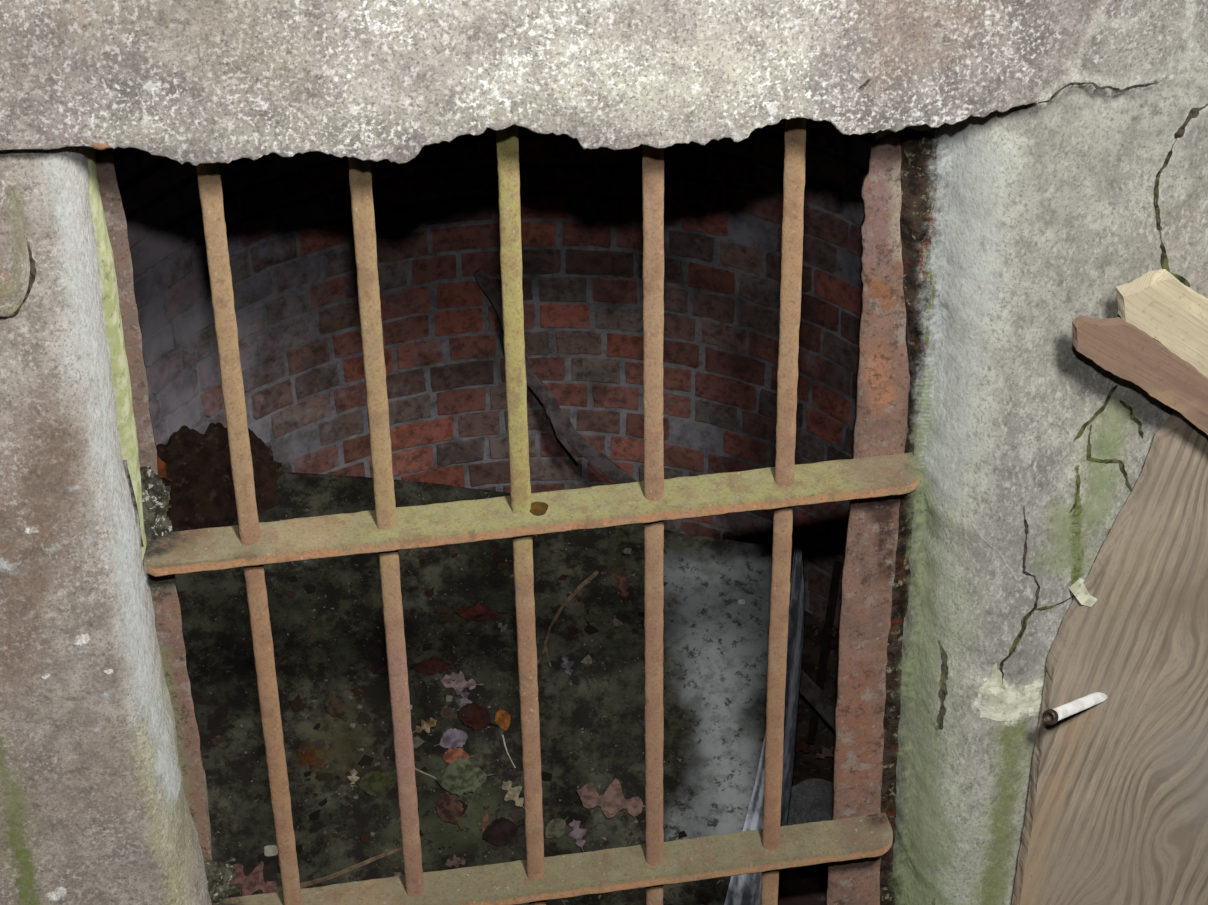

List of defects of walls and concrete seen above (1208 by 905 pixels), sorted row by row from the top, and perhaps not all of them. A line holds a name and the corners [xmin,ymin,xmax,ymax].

crack [1037,0,1208,106]
crack [1154,103,1208,286]
damp [49,168,180,797]
rust [529,501,548,515]
damp [900,124,995,905]
crack [1000,506,1075,684]
crack [1070,384,1144,513]
crack [936,640,948,730]